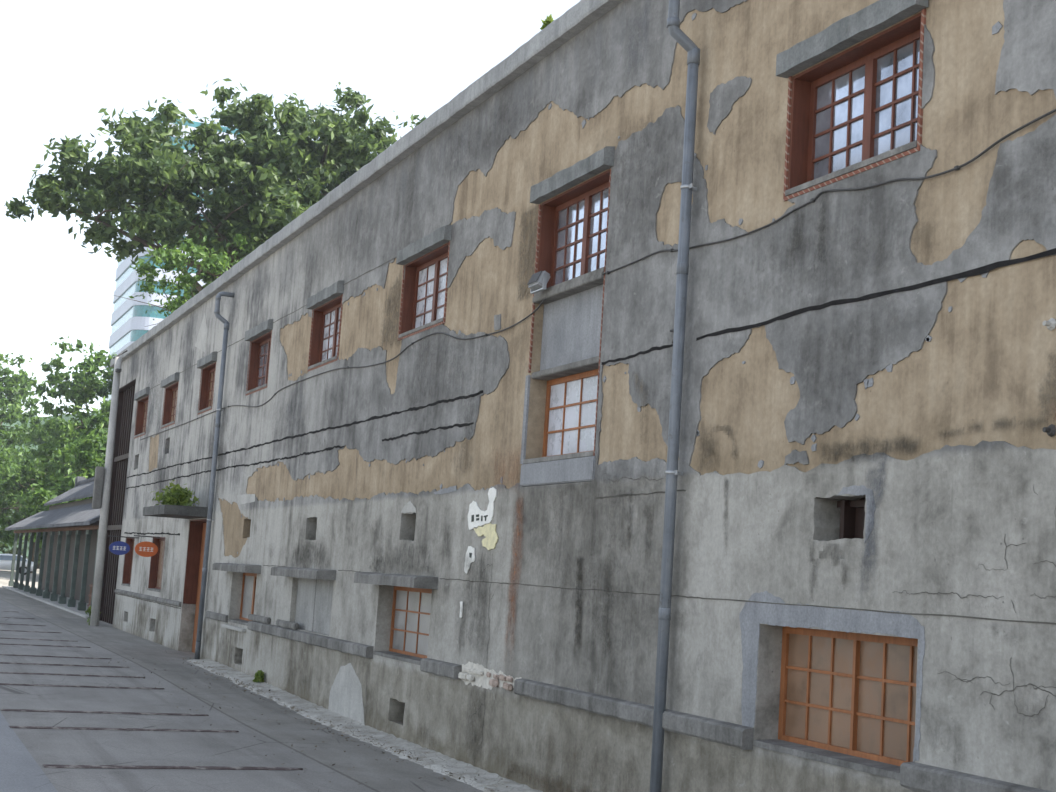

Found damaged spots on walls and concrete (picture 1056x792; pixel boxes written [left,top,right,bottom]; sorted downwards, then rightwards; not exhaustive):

flaking render [246,0,1056,574]
flaking render [219,498,251,558]
crack [893,537,1056,613]
peeling [458,666,519,690]
crack [938,657,1056,717]